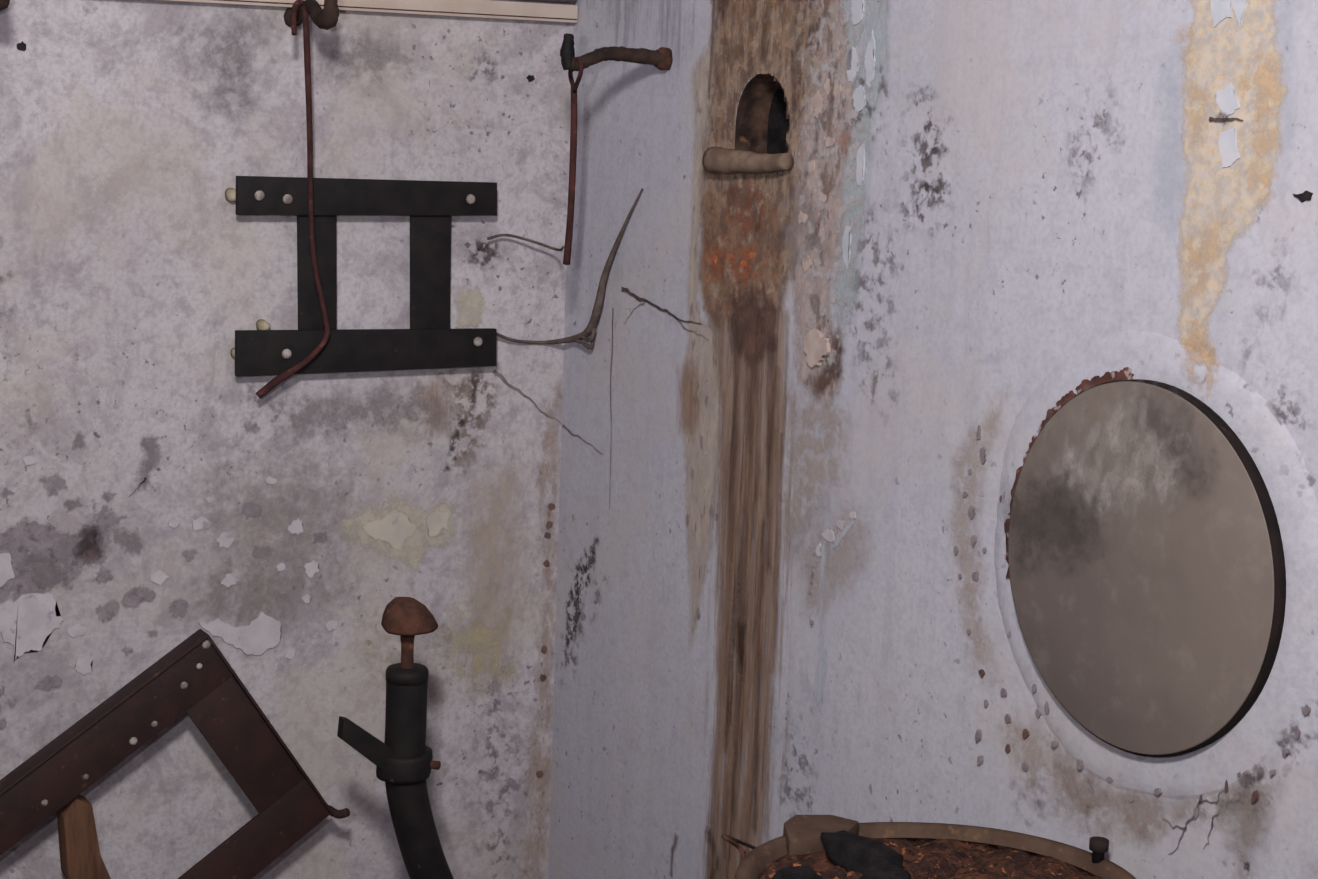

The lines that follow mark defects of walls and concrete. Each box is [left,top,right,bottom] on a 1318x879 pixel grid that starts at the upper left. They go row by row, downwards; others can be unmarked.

damp [902,103,946,222]
peeling [1178,0,1286,379]
damp [682,0,841,630]
peeling [40,474,81,510]
peeling [0,493,142,662]
peeling [97,570,169,621]
spalling [129,438,159,497]
peeling [168,496,235,548]
peeling [170,574,295,659]
peeling [287,518,326,543]
peeling [303,560,319,578]
damp [565,538,599,665]